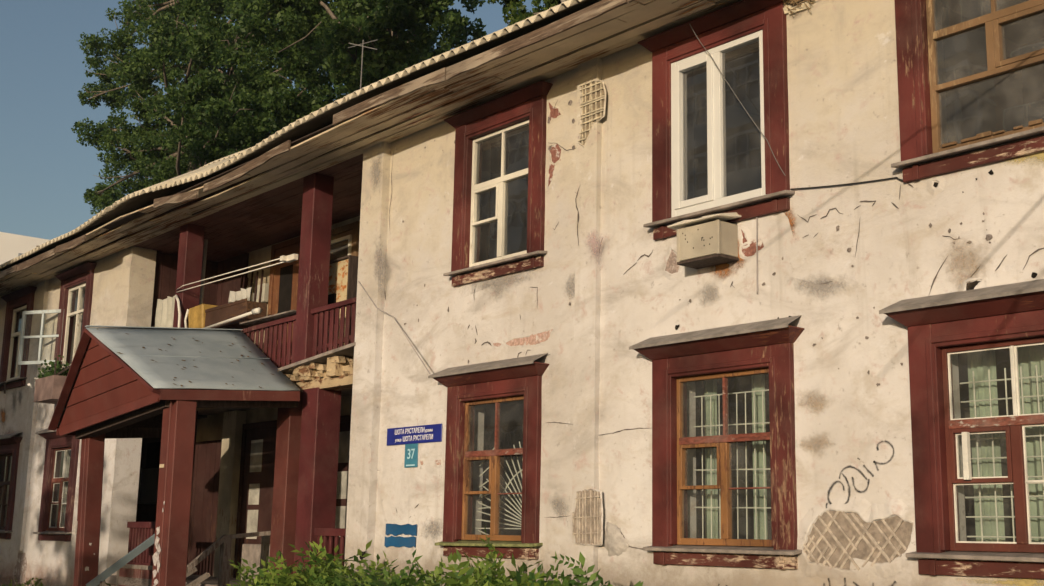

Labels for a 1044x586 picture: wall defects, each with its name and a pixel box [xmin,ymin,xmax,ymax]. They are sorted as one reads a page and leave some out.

spalling [783,0,815,15]
peeling [546,80,606,190]
crack [798,183,914,256]
peeling [492,327,555,350]
spalling [573,488,603,546]
spalling [795,496,916,584]